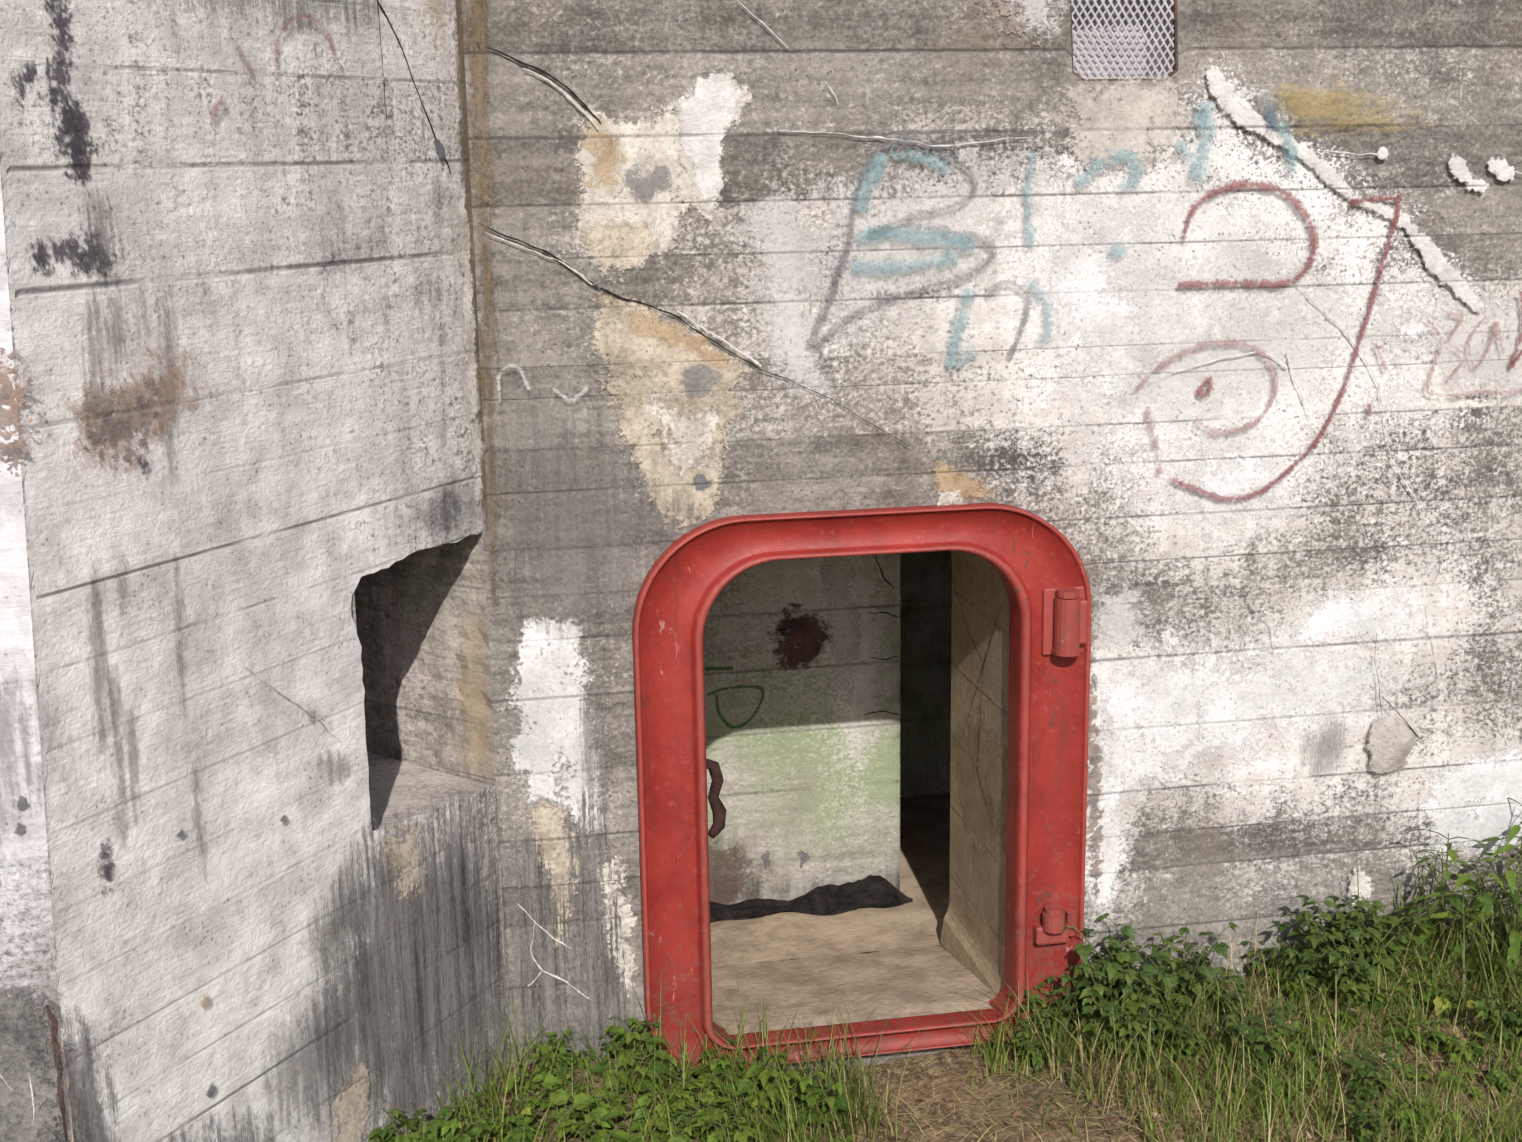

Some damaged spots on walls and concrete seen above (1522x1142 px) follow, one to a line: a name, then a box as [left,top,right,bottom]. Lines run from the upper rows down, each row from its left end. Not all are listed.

damp [13,0,97,185]
damp [26,225,117,277]
crack [377,0,451,174]
crack [478,44,601,130]
flaking render [572,69,753,527]
crack [479,223,909,447]
peeling [748,52,1522,549]
damp [1206,67,1484,312]
rust [767,602,835,671]
damp [96,838,115,895]
damp [310,782,642,1142]
peeling [508,617,638,1001]